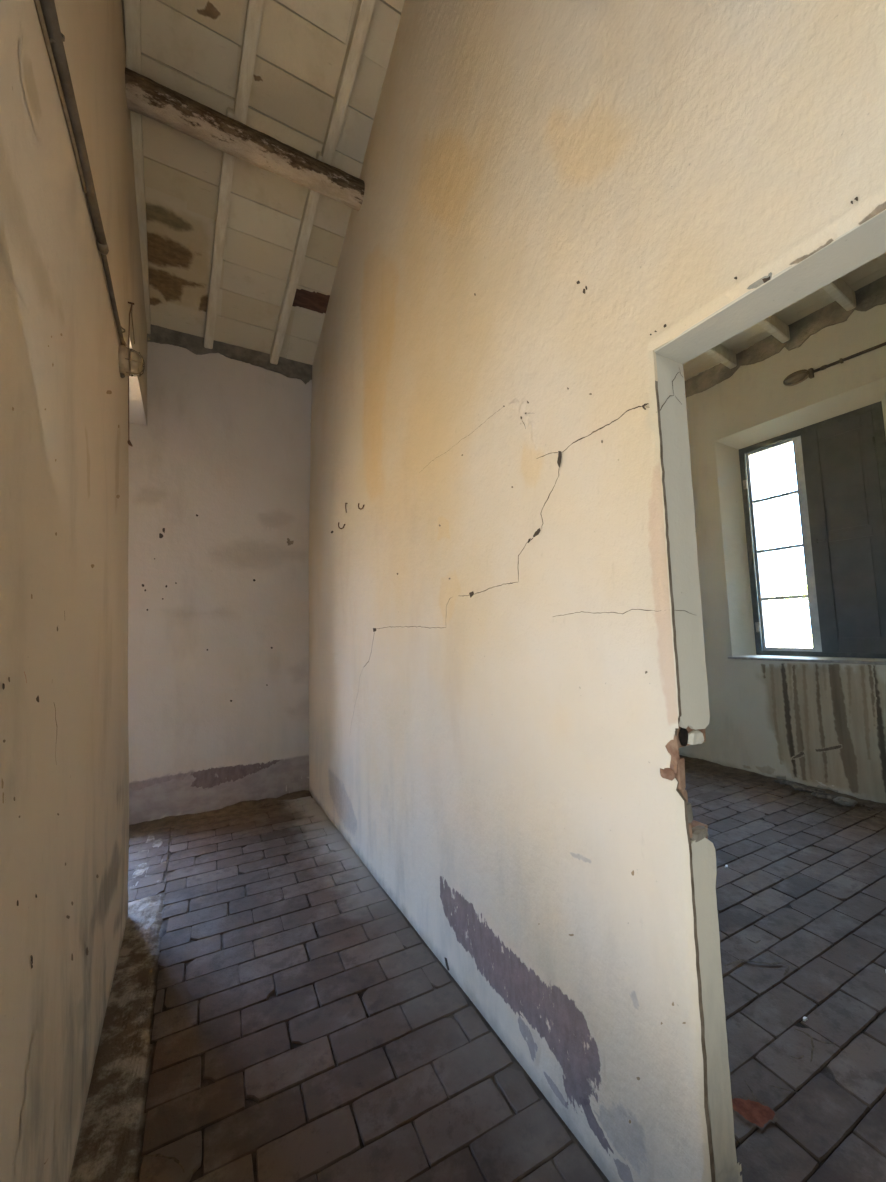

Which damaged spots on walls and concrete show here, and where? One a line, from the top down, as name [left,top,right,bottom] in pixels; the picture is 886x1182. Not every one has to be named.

leakage [145,186,214,316]
crack [350,368,694,731]
peeling [129,750,309,825]
leakage [749,661,886,803]
peeling [439,872,637,1182]